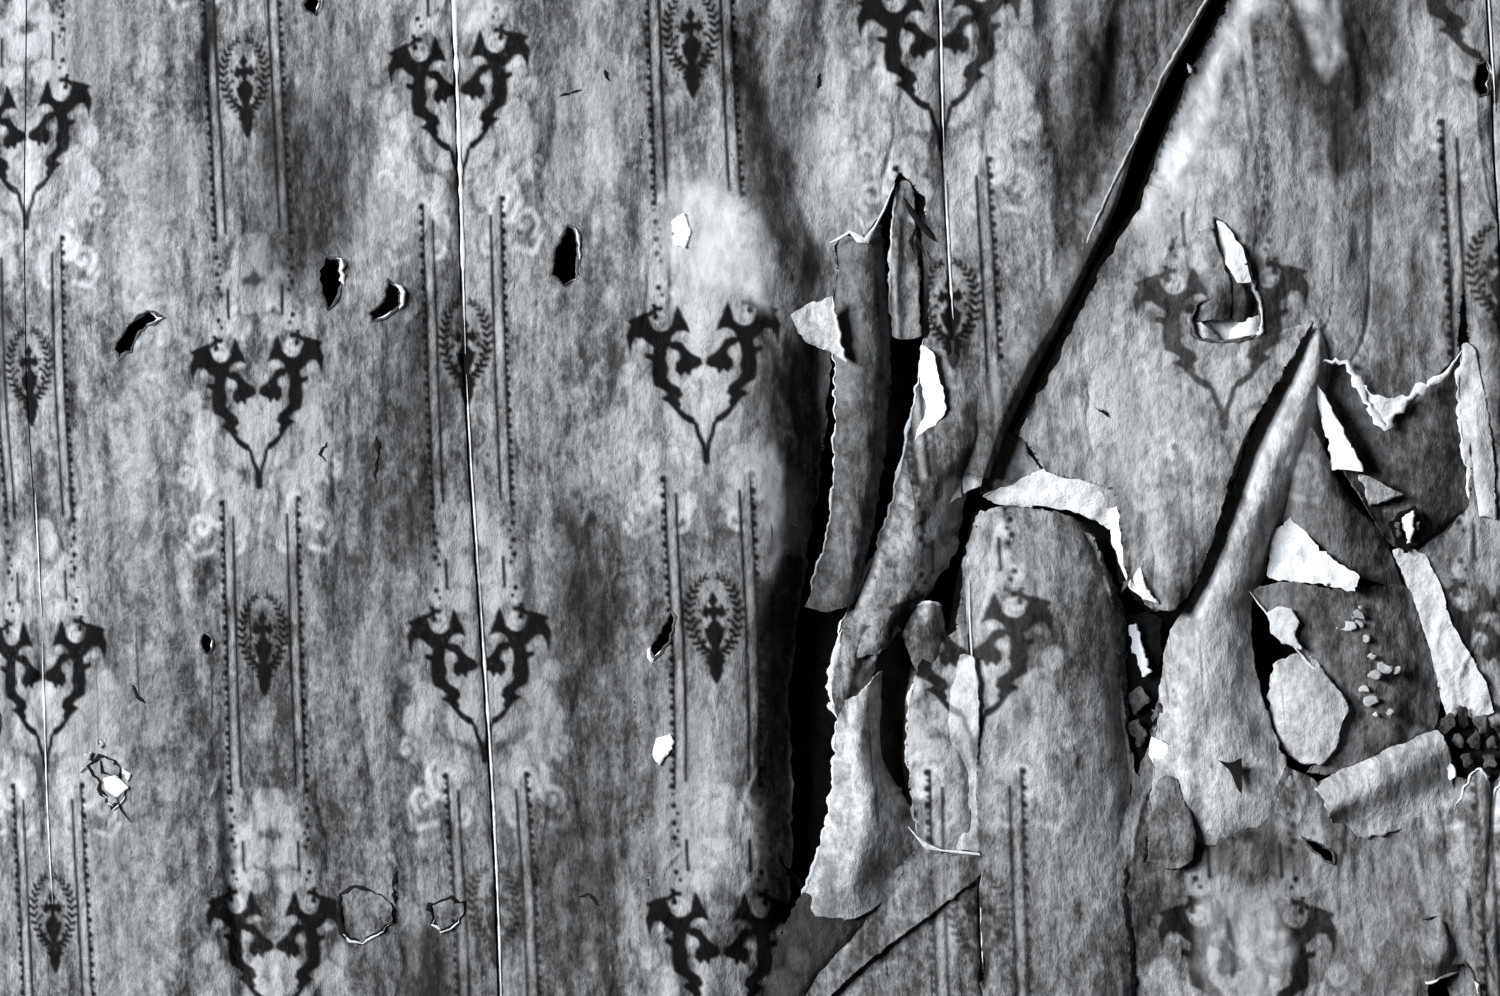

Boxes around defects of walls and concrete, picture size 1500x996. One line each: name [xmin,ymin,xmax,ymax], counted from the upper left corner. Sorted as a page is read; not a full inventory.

flaking render [320,258,346,308]
flaking render [370,282,406,320]
flaking render [553,227,582,285]
peeling [887,179,922,340]
flaking render [1192,219,1265,341]
flaking render [115,311,161,355]
peeling [982,469,1159,604]
peeling [1249,341,1497,839]
peeling [1149,737,1169,763]
flaking render [1306,840,1332,862]
peeling [806,845,981,996]
flaking render [1428,977,1449,996]